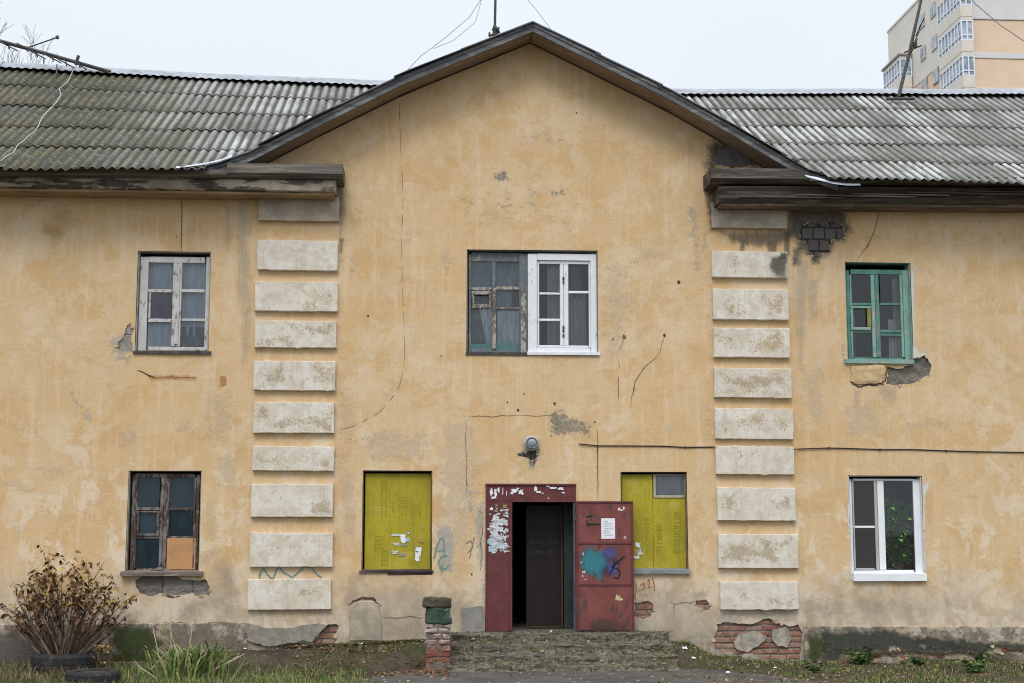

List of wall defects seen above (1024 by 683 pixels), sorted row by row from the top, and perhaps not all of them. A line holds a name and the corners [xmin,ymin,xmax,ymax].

water stain [730,231,819,264]
flaking render [798,220,844,256]
flaking render [110,324,134,365]
flaking render [886,270,931,387]
crack [618,338,664,401]
peeling [544,402,596,438]
flaking render [136,567,212,597]
flaking render [312,624,339,645]
flaking render [634,599,655,619]
flaking render [695,592,802,662]
water stain [809,631,1024,662]